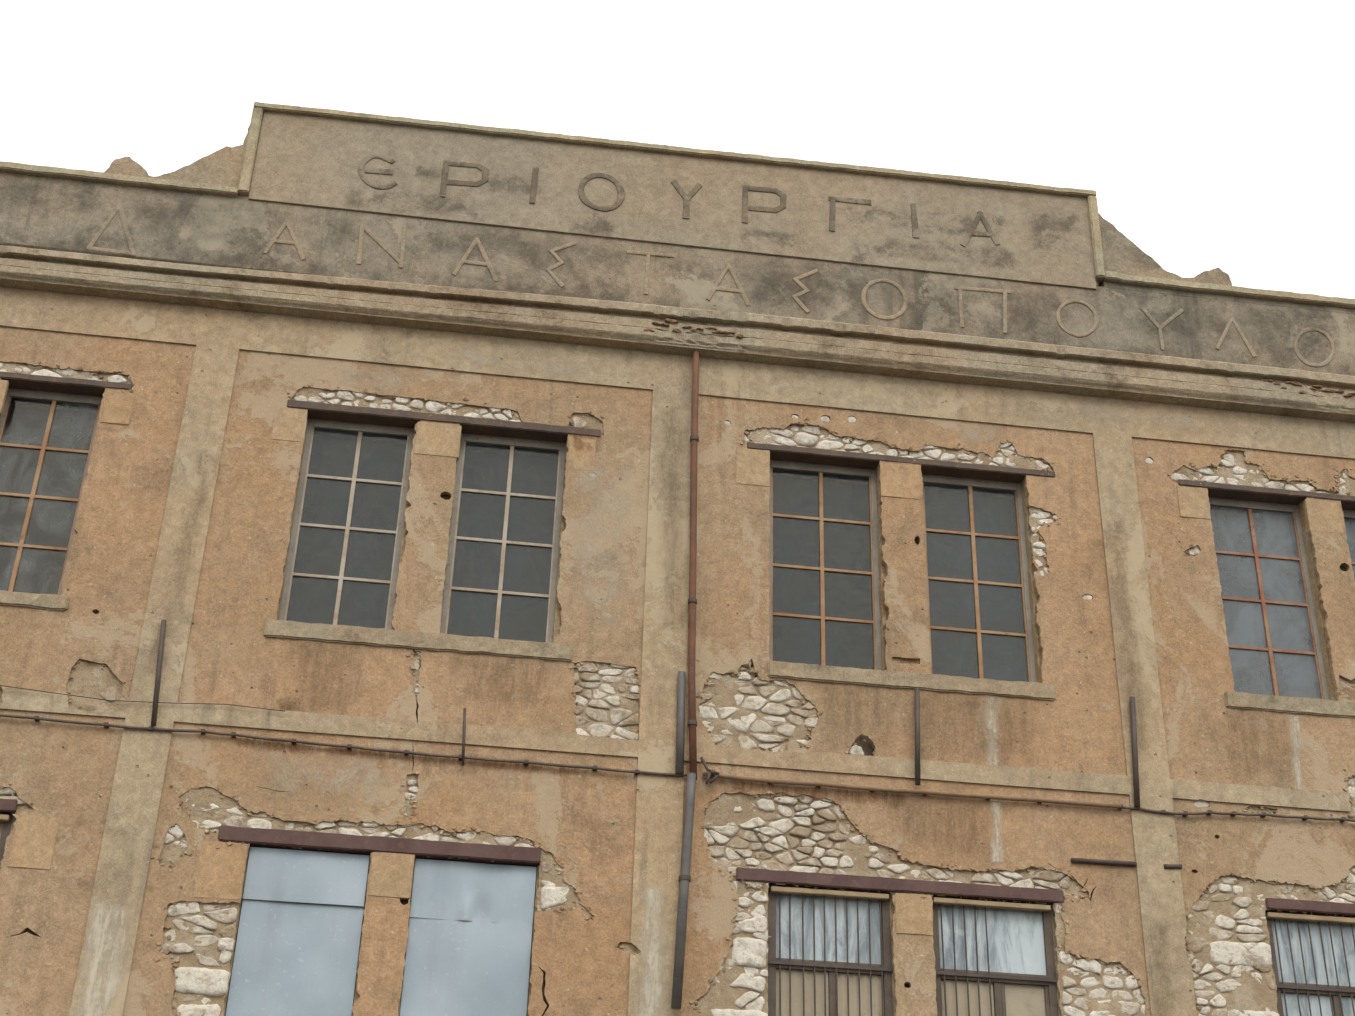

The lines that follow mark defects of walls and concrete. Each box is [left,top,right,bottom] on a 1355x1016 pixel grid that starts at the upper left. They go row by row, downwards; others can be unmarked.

spalling [0,361,134,392]
spalling [288,384,522,422]
spalling [725,415,1054,476]
spalling [1167,449,1355,497]
spalling [1029,507,1061,576]
spalling [570,661,641,740]
spalling [696,663,823,752]
spalling [0,783,33,815]
spalling [150,772,594,920]
spalling [689,786,1149,1016]
spalling [154,899,241,1016]
spalling [1184,866,1355,1016]